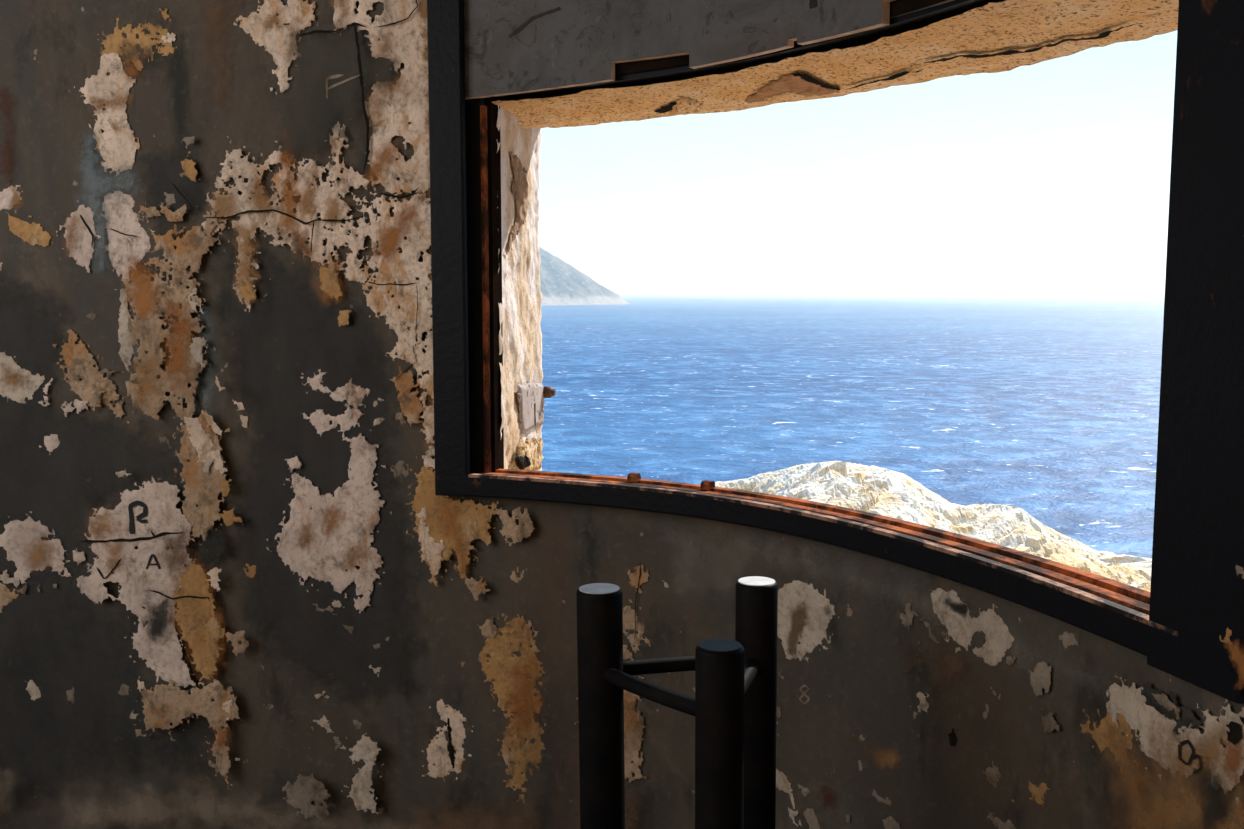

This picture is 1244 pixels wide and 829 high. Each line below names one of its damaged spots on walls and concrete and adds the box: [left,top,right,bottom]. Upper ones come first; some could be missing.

crack [171,0,418,252]
peeling [0,0,536,786]
spalling [478,614,546,804]
peeling [777,580,839,662]
peeling [917,692,929,712]
peeling [900,588,1016,666]
peeling [1029,659,1059,733]
peeling [1059,631,1078,649]
rust [1219,627,1244,684]
peeling [282,715,384,825]
peeling [1028,781,1050,805]
peeling [1079,675,1244,829]